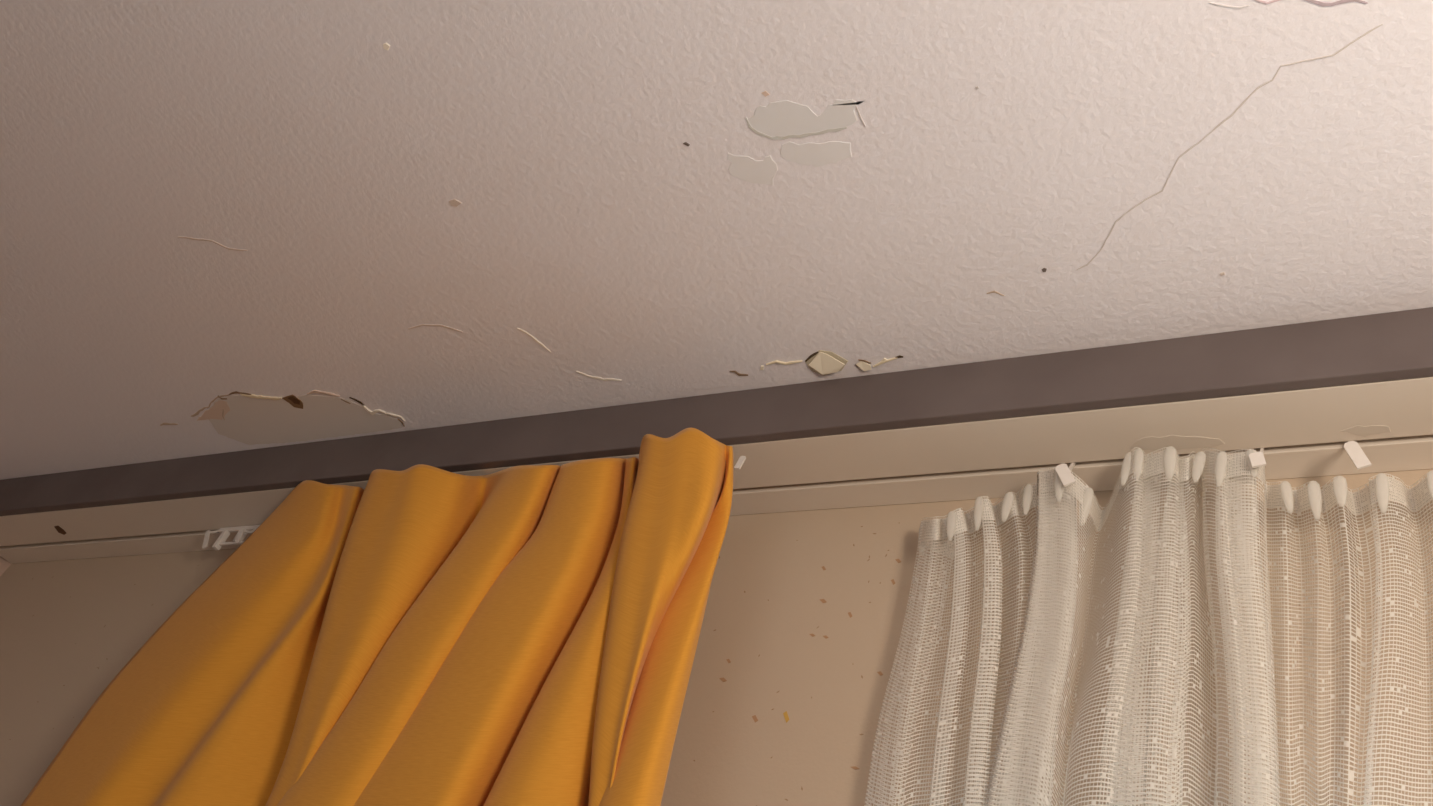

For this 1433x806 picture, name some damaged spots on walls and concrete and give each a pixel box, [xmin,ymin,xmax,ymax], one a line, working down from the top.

crack [1077,0,1383,270]
peeling [766,350,897,376]
flaking render [209,390,405,445]